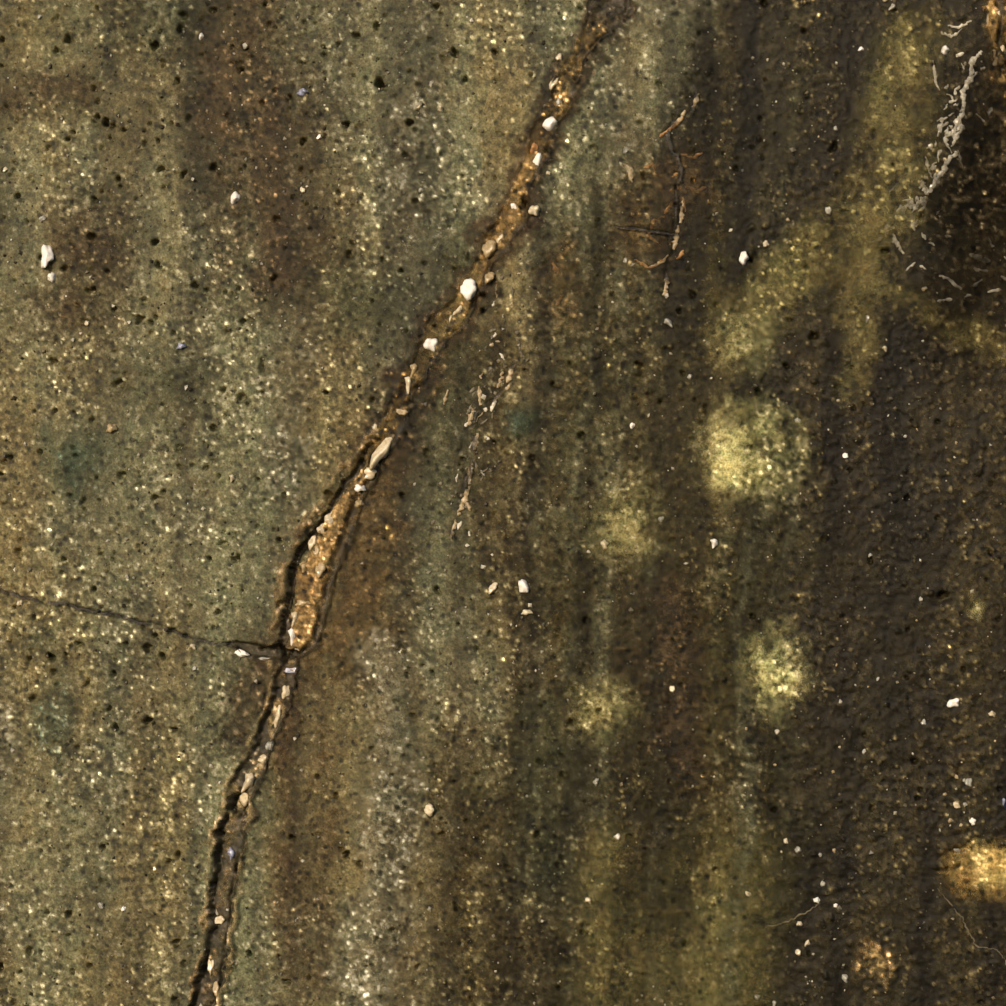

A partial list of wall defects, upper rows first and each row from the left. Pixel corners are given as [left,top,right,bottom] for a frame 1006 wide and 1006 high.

leakage [388,83,432,205]
crack [613,87,706,296]
crack [0,0,637,1006]
leakage [445,335,504,487]
leakage [491,0,1006,1006]
leakage [271,655,331,961]
leakage [302,634,418,1006]
leakage [444,742,523,1006]